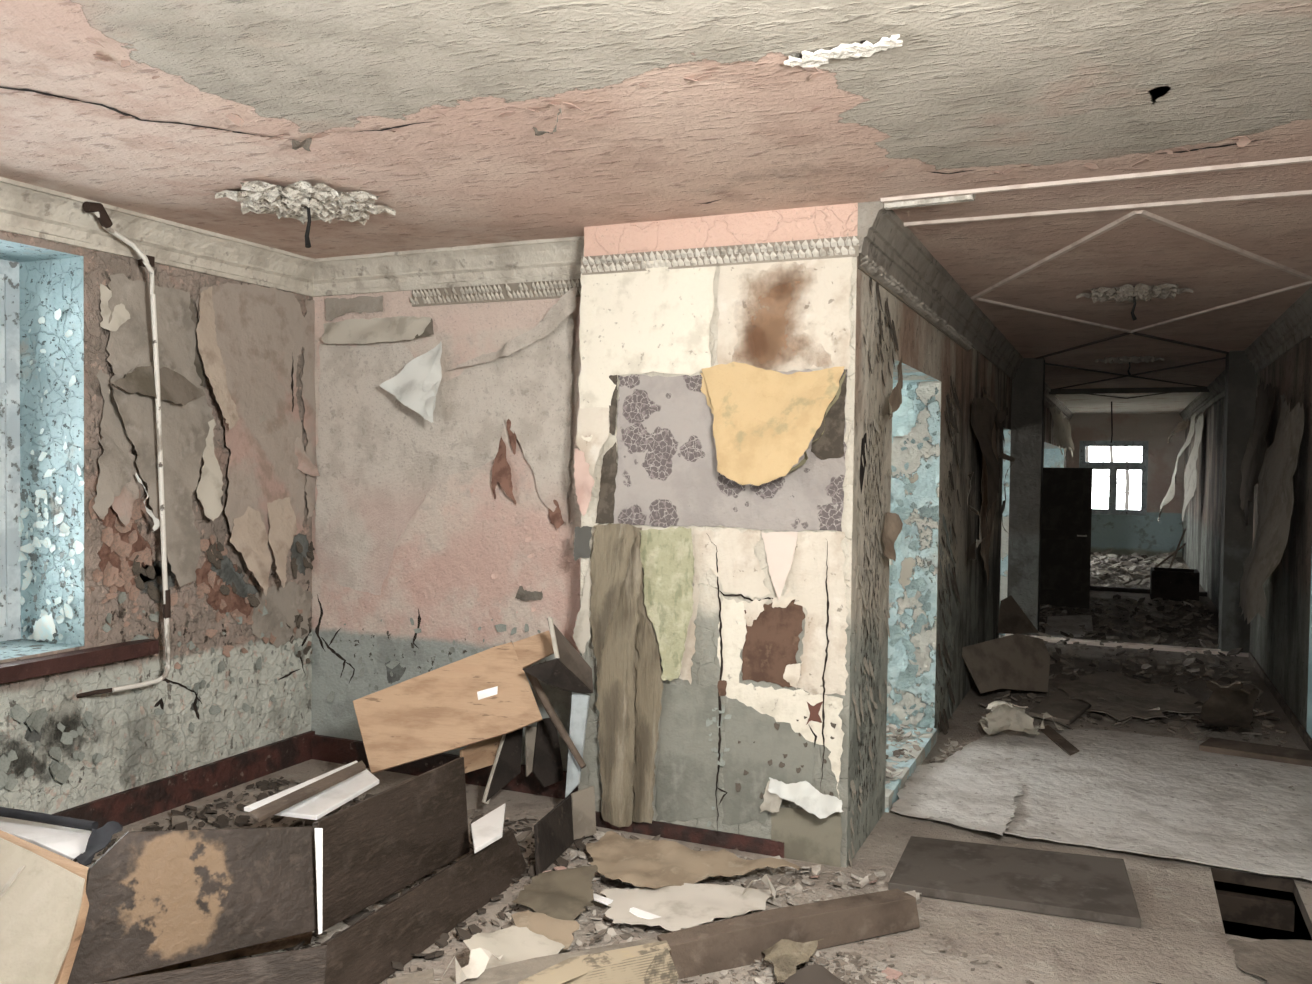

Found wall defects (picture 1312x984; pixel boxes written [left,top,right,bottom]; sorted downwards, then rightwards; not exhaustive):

crack [0,86,302,141]
peeling [71,0,1312,175]
peeling [28,308,73,338]
peeling [100,284,130,331]
peeling [380,285,577,423]
peeling [18,436,315,743]
crack [279,580,355,683]
peeling [332,601,541,695]
peeling [761,531,798,600]
peeling [848,277,961,867]
peeling [722,698,836,826]